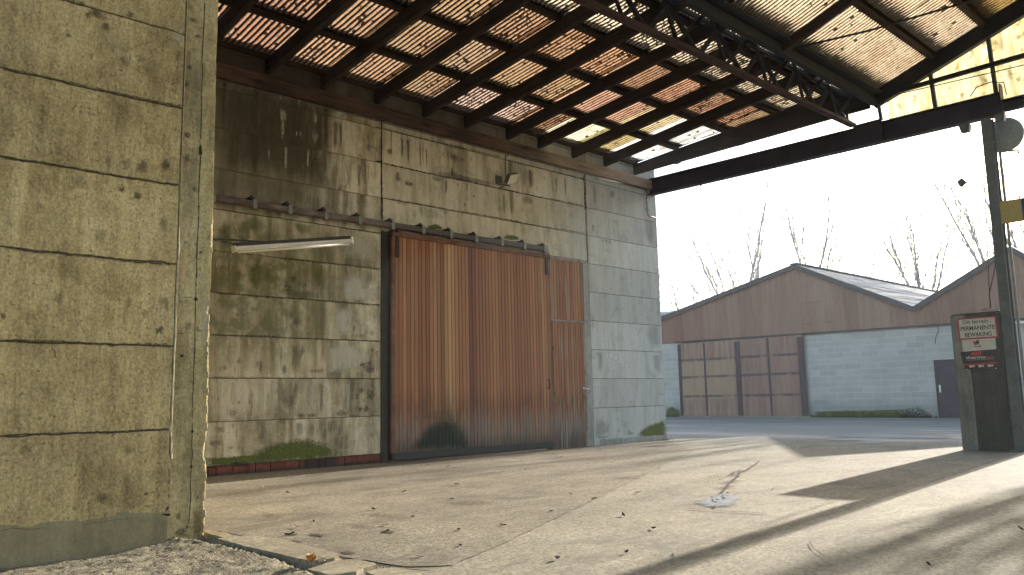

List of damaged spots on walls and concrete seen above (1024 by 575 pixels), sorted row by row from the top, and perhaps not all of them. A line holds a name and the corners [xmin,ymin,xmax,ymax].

damp [384,128,583,206]
damp [385,198,582,233]